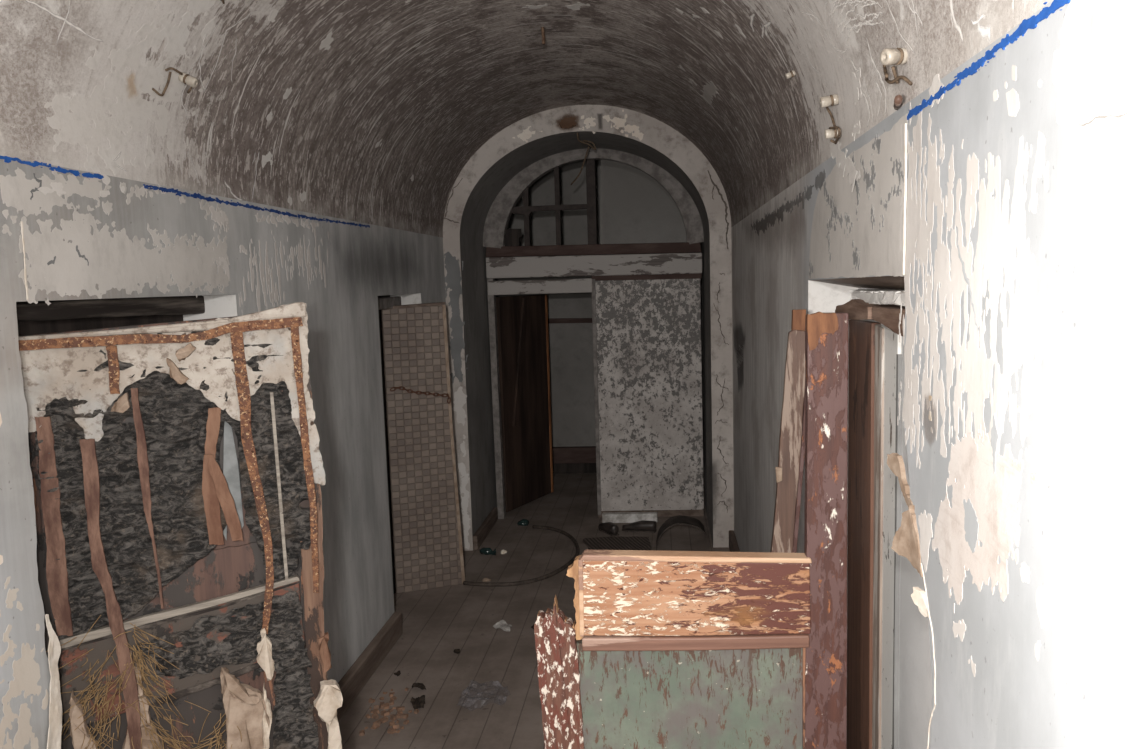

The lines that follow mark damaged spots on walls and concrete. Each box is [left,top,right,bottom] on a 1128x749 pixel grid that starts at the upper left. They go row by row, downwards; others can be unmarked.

peeling [319,31,334,50]
peeling [993,65,1019,117]
peeling [0,0,329,315]
peeling [512,126,542,143]
peeling [579,110,644,141]
peeling [887,74,1069,749]
peeling [0,576,62,749]